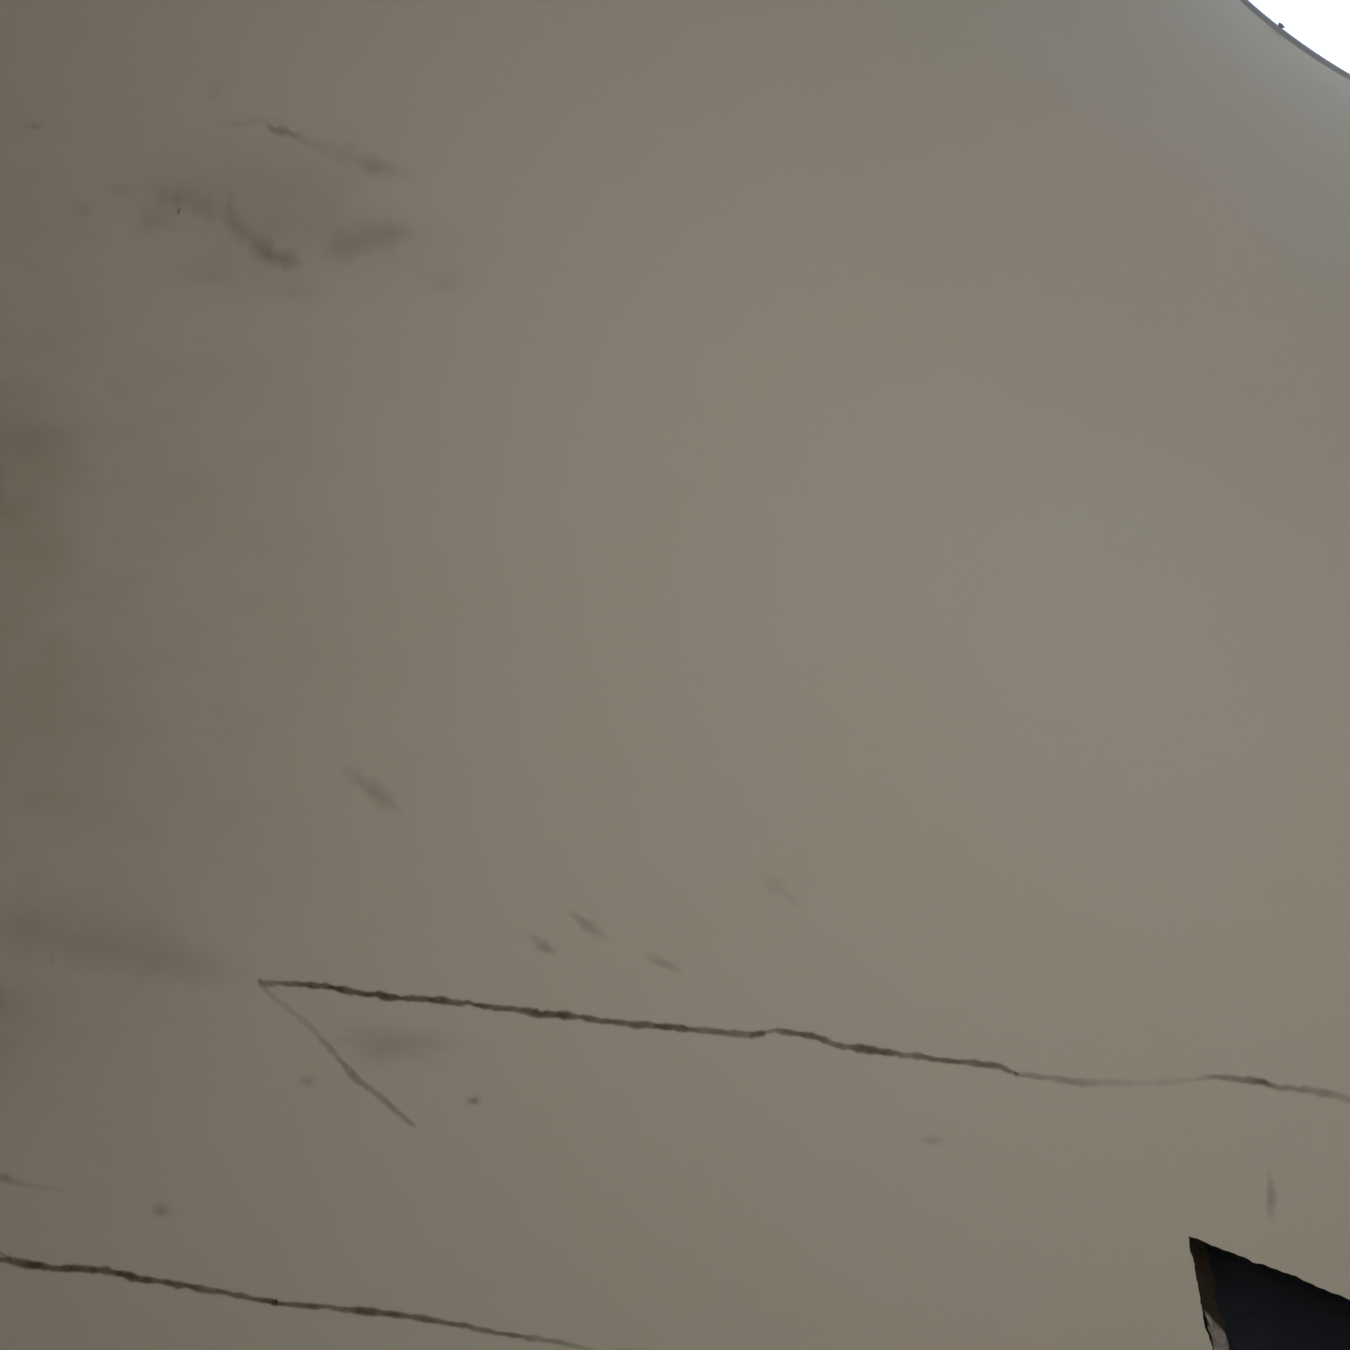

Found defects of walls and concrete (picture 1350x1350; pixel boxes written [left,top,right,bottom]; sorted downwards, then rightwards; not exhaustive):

crack [297,983,723,1033]
crack [783,1030,993,1067]
crack [4,1259,318,1309]
crack [350,1307,454,1325]
spalling [1188,1236,1350,1350]